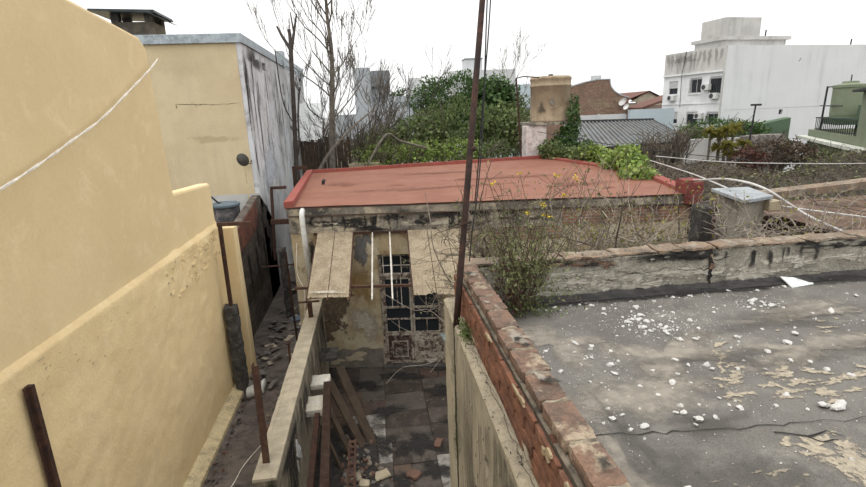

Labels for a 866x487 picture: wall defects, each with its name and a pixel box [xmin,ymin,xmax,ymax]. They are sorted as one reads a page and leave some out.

damp [242,51,302,174]
damp [351,271,371,300]
damp [522,261,603,279]
crack [567,249,732,286]
damp [634,249,728,262]
damp [768,239,866,265]
peeling [711,341,866,404]
peeling [778,427,866,487]